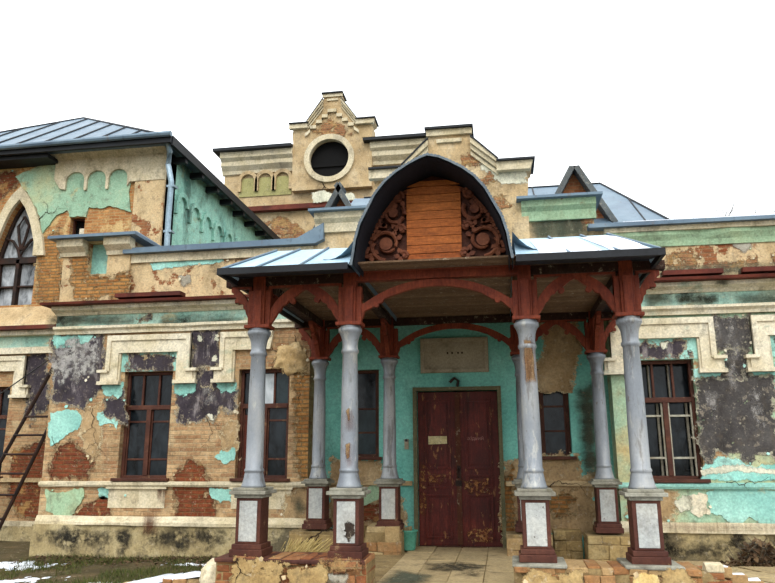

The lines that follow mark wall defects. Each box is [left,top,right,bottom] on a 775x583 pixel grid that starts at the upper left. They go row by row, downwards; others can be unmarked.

spalling [0,169,19,201]
spalling [33,226,134,304]
flaking render [524,322,583,394]
peeling [639,338,694,360]
peeling [6,334,129,521]
peeling [172,330,242,464]
peeling [660,313,775,524]
spalling [170,458,232,517]
flaking render [542,449,596,537]
mould [51,531,108,552]
leakage [152,531,222,550]
leakage [663,533,746,558]